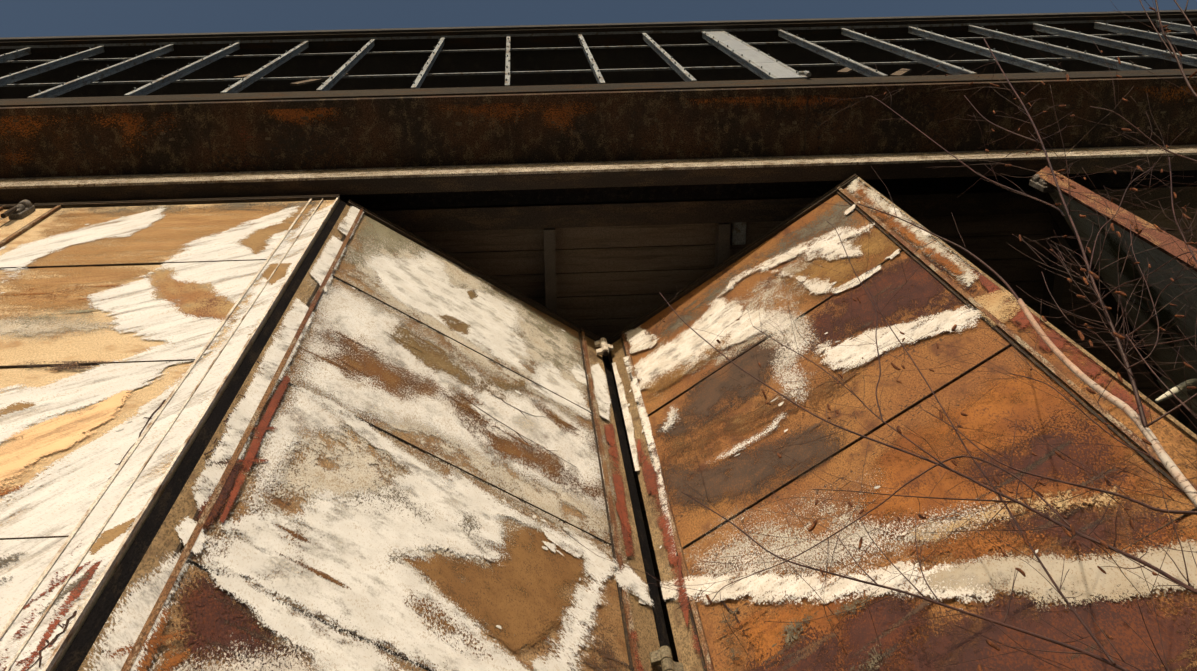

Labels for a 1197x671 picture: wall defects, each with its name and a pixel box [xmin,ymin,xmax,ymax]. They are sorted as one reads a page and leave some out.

corrosion [0,112,176,171]
corrosion [262,108,341,127]